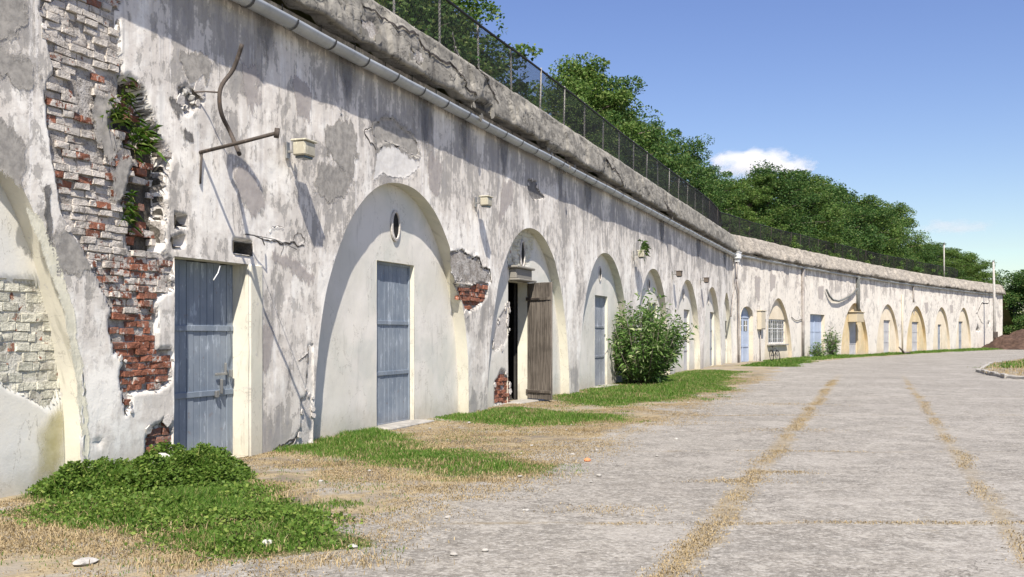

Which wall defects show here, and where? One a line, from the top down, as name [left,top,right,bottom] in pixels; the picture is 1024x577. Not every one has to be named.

crack [361,1,499,104]
peeling [169,49,212,142]
crack [364,113,420,158]
spalling [372,115,442,196]
flaking render [0,0,186,459]
crack [262,232,305,253]
spalling [450,249,491,318]
flaking render [494,371,512,404]